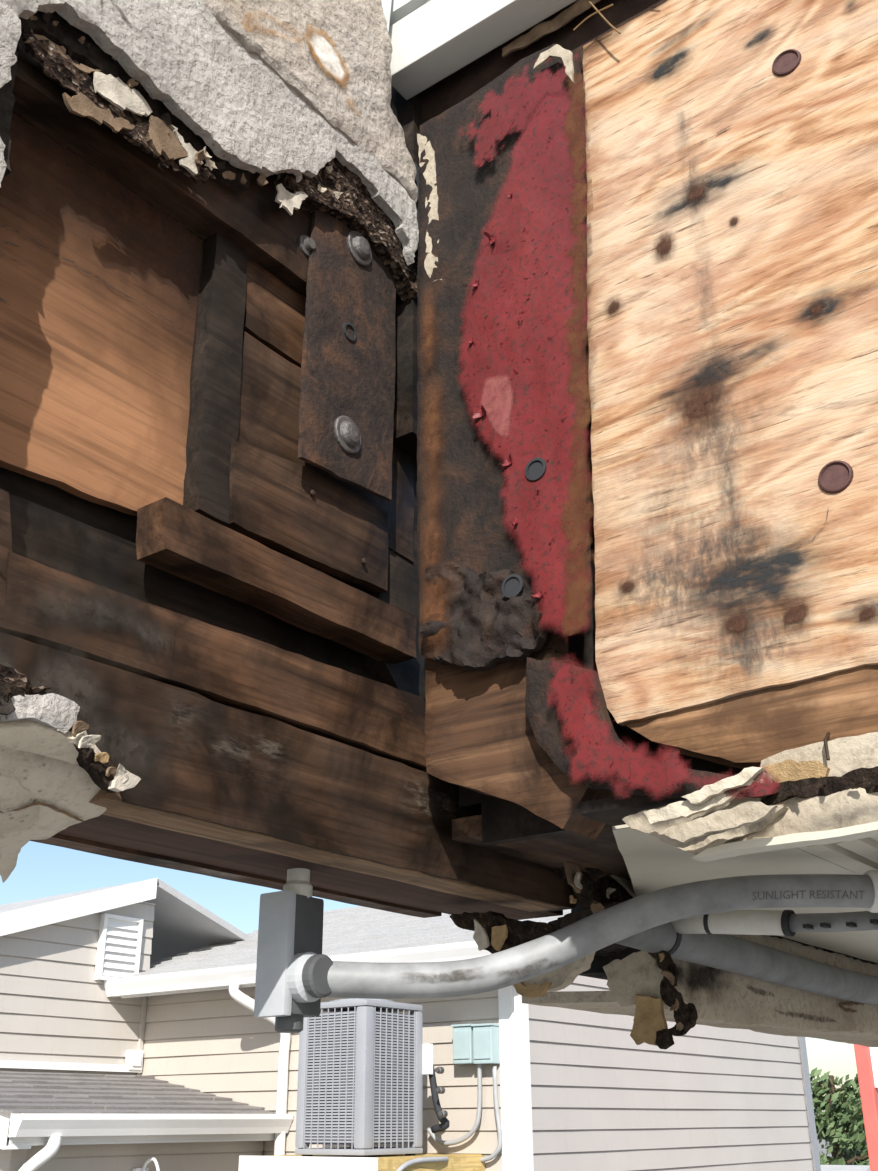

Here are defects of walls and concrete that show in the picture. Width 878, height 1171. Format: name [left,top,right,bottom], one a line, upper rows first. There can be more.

corrosion [306,25,349,87]
flaking render [0,11,418,303]
peeling [459,54,595,635]
damp [662,343,774,451]
damp [620,524,809,665]
flaking render [0,664,141,794]
peeling [547,663,779,797]
crack [0,801,86,822]